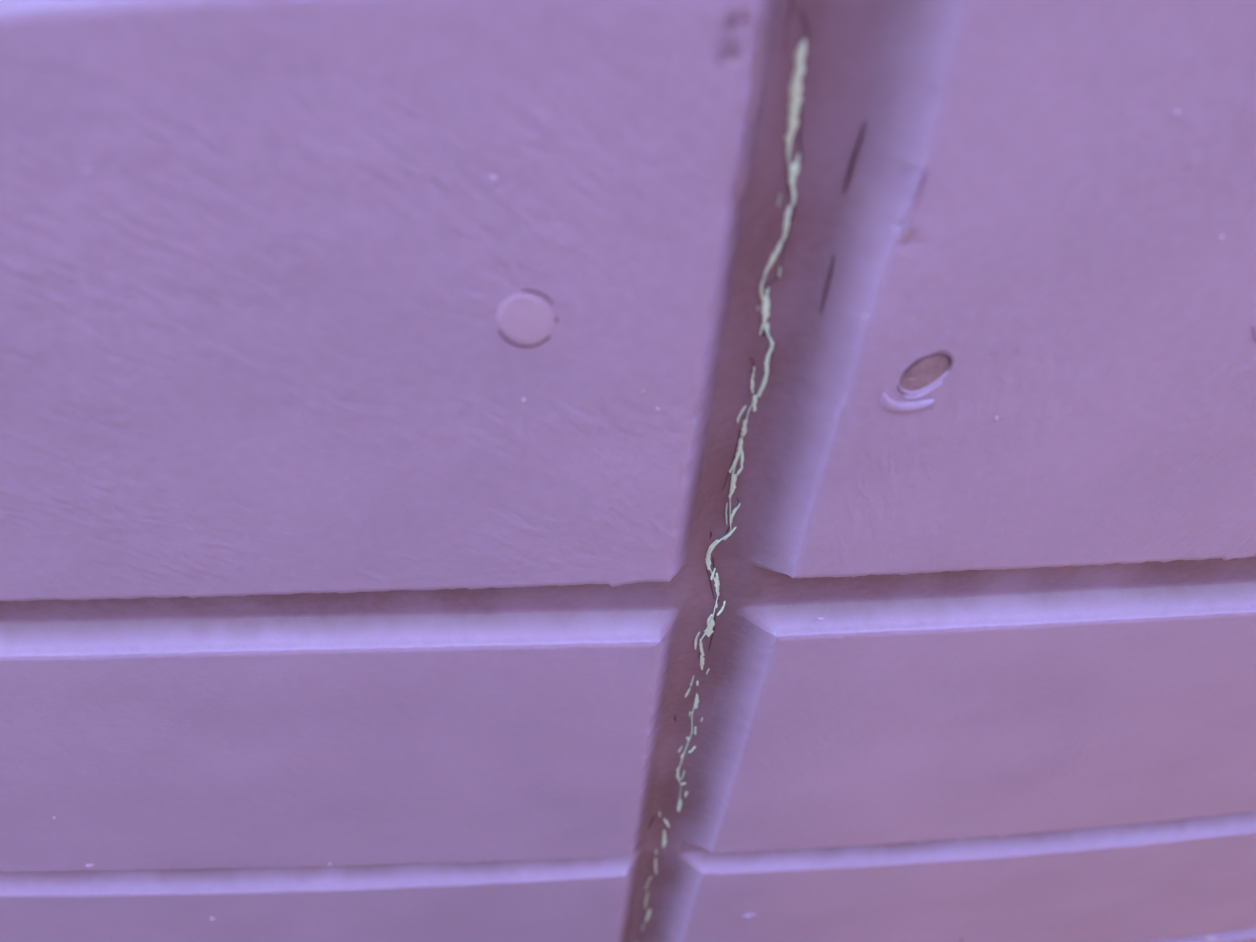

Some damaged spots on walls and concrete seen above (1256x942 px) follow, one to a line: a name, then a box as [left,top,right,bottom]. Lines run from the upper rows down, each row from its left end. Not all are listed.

crack [637,0,808,942]
spalling [880,353,952,414]